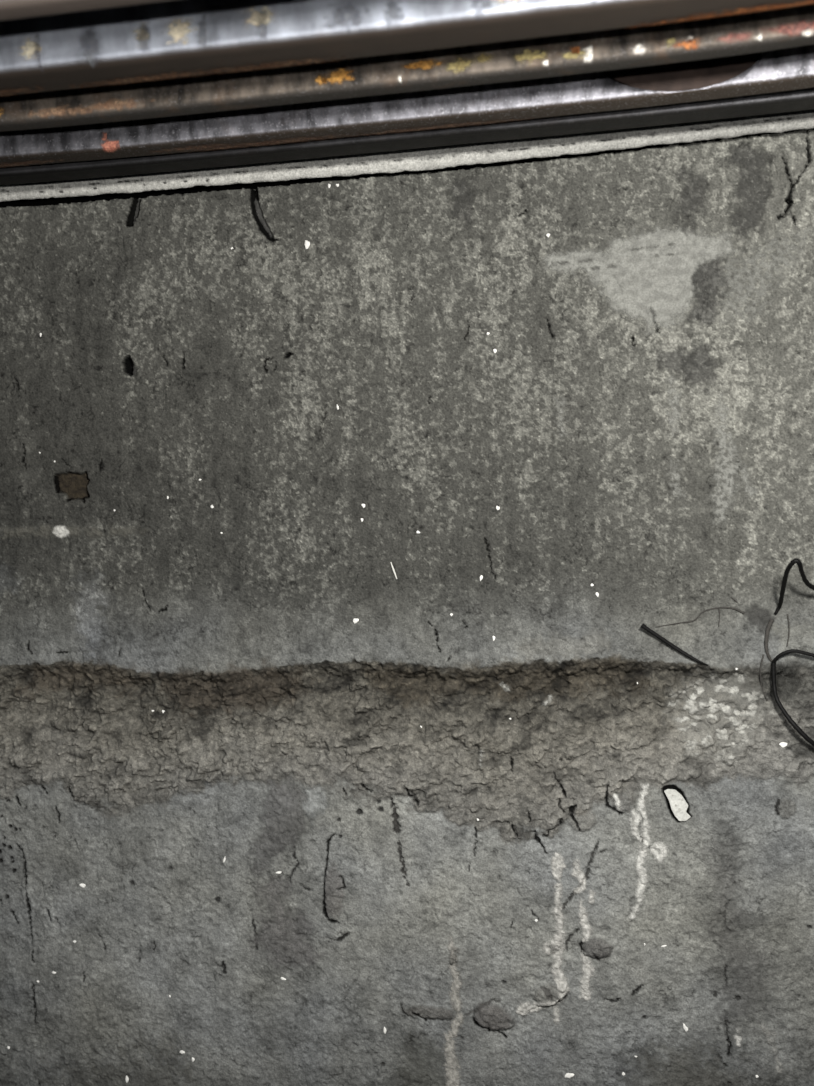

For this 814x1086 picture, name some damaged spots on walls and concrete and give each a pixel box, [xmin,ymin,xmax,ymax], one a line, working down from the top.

corrosion [399,53,491,82]
corrosion [516,49,548,66]
corrosion [563,46,593,61]
corrosion [667,37,697,49]
corrosion [720,21,814,41]
corrosion [102,133,119,152]
crack [0,118,813,223]
water stain [613,784,667,919]
crack [11,845,60,1022]
water stain [516,853,594,1022]
water stain [399,937,463,1086]